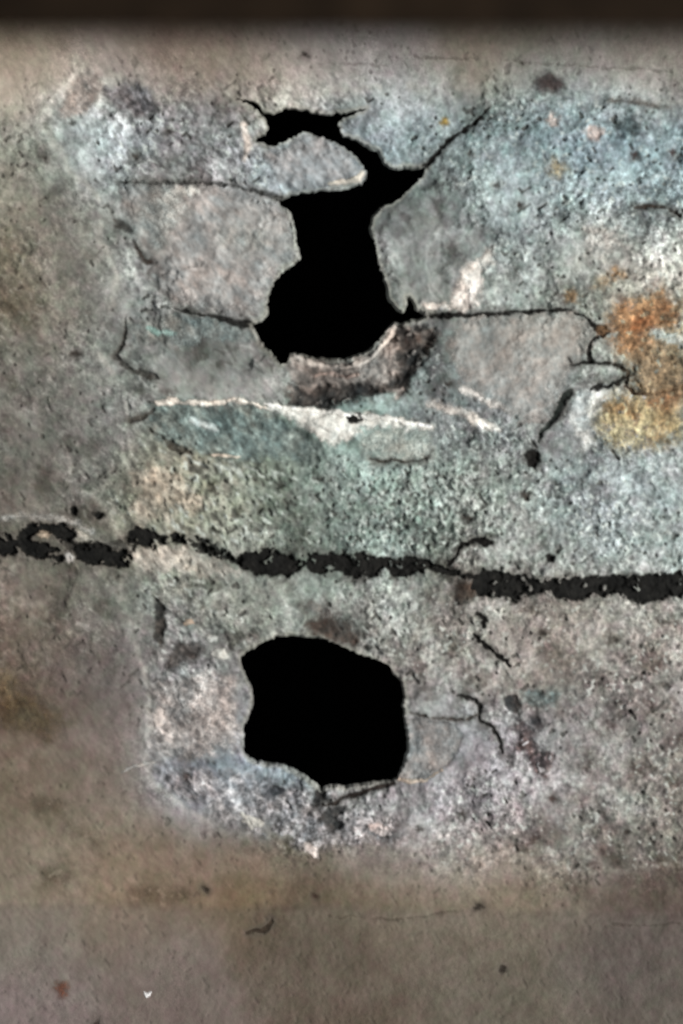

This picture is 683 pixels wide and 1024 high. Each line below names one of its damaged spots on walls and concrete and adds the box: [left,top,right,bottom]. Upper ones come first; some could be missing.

crack [421,108,489,169]
crack [175,308,251,329]
spalling [127,98,436,463]
crack [429,307,683,443]
rust [602,290,683,443]
spalling [153,599,166,645]
crack [0,506,683,667]
spalling [124,633,464,858]